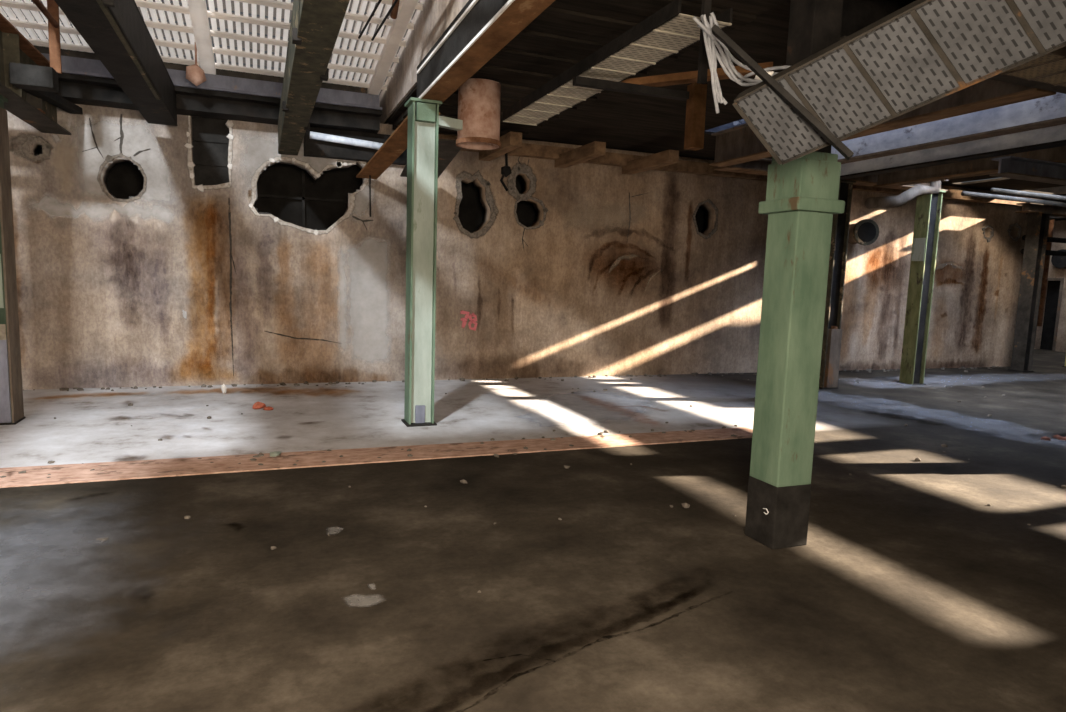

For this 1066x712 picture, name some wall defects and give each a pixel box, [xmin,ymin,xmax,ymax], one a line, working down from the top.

peeling [35,122,171,220]
spalling [184,116,234,192]
spalling [246,138,369,235]
hole [453,170,499,238]